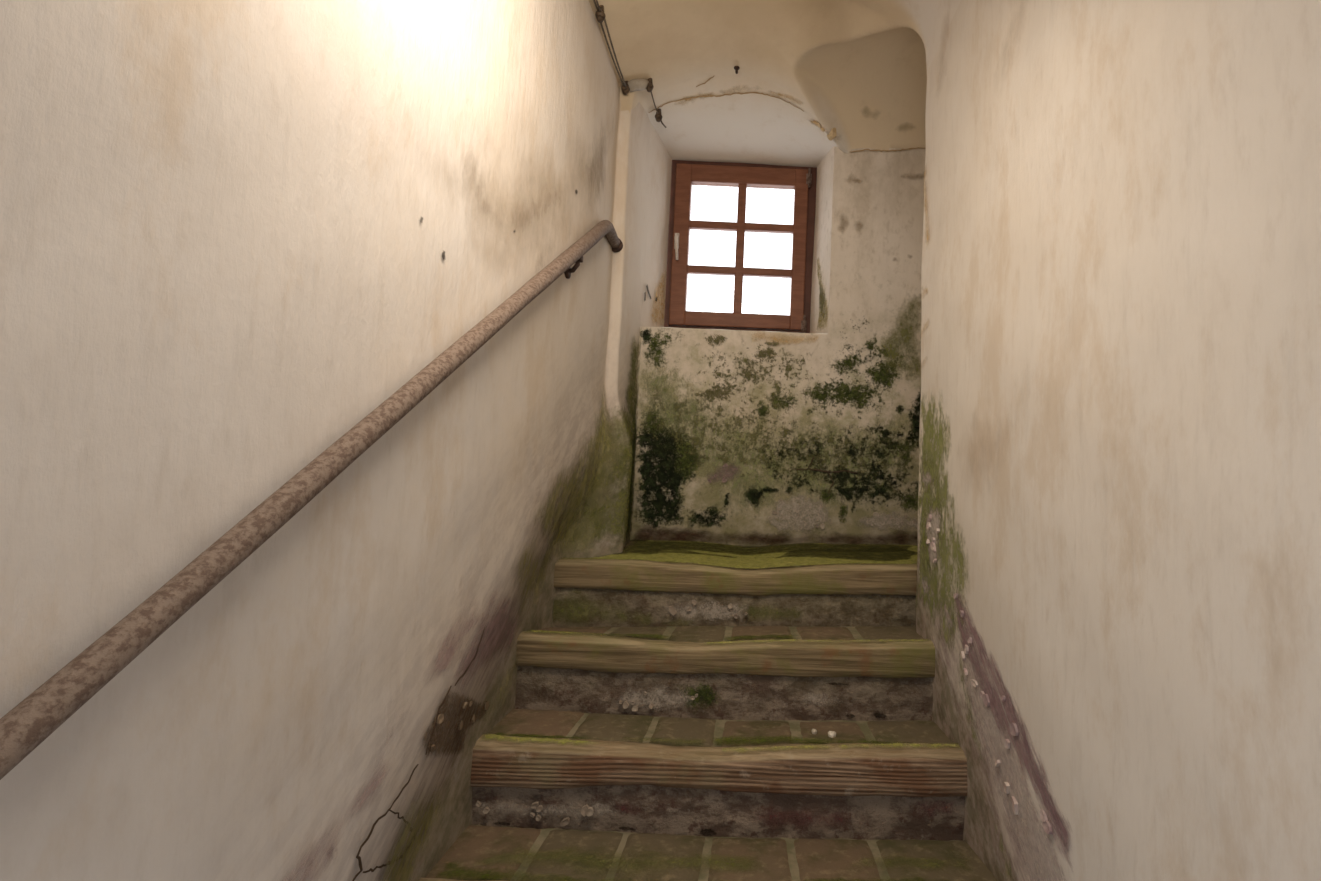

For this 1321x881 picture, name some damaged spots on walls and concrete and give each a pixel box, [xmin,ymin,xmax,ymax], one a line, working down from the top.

damp [633,528,789,545]
damp [828,505,918,544]
peeling [926,509,941,563]
peeling [945,594,1068,850]